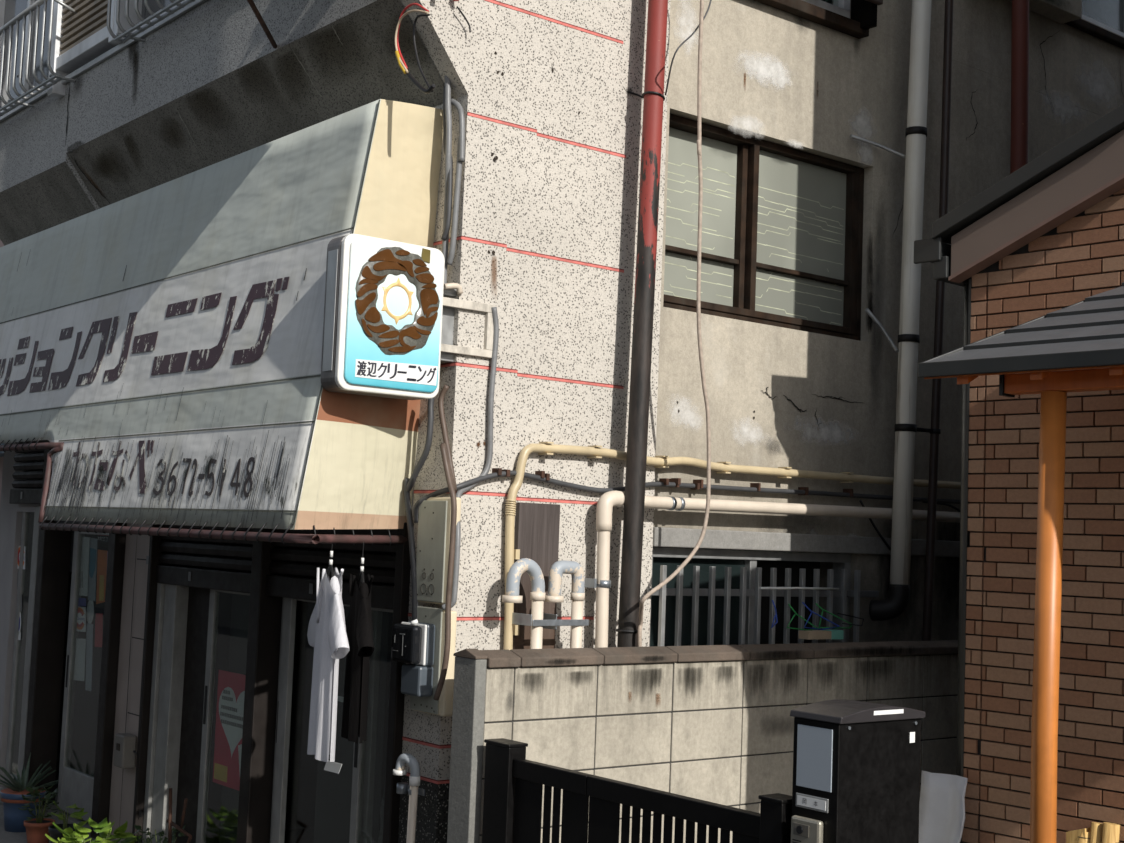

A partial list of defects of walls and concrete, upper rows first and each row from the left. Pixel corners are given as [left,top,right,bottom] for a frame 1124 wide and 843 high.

leakage [129,42,138,83]
crack [761,387,862,426]
leakage [638,656,663,688]
leakage [686,669,700,689]
leakage [750,651,798,682]
leakage [826,647,911,677]